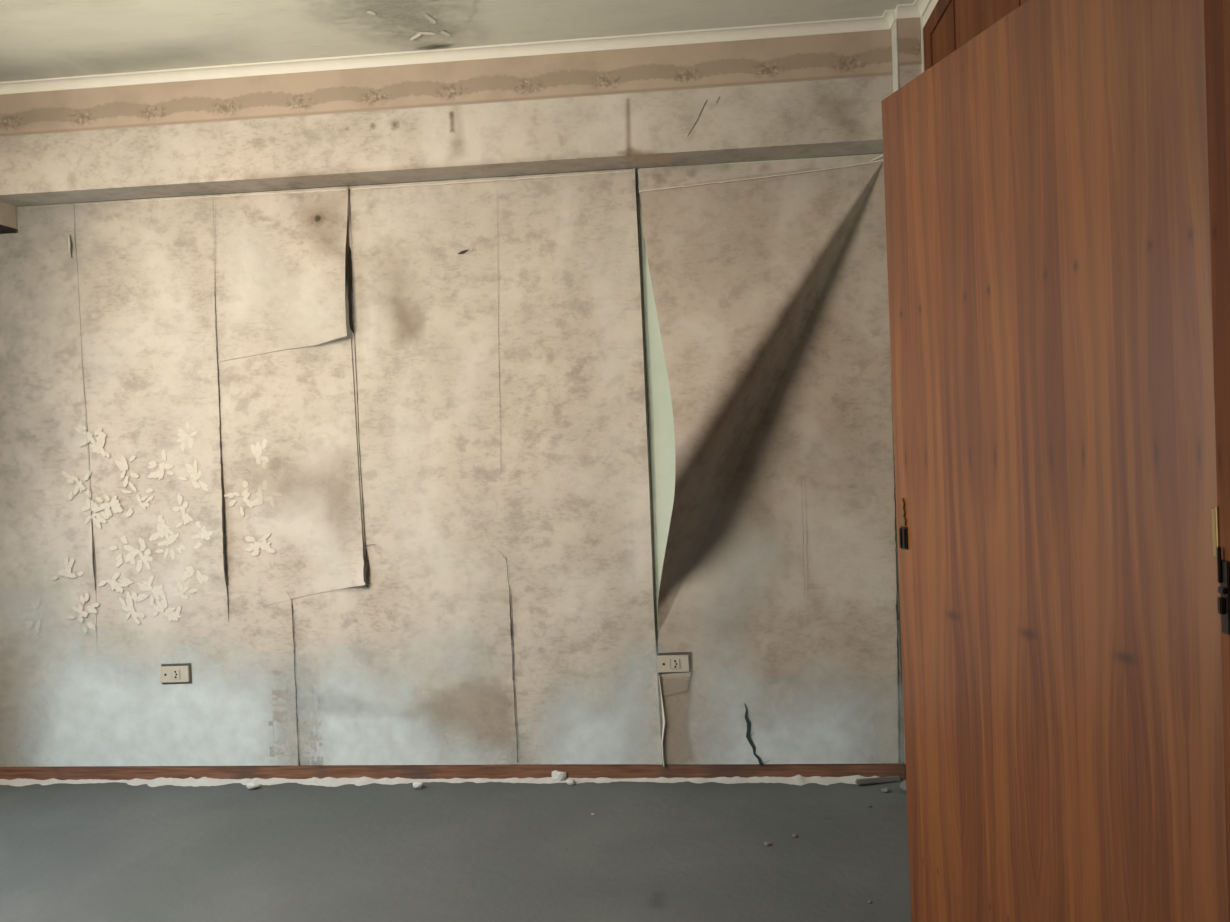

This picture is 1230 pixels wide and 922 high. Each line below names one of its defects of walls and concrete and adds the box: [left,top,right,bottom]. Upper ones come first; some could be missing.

water stain [367,0,451,49]
crack [744,703,767,765]